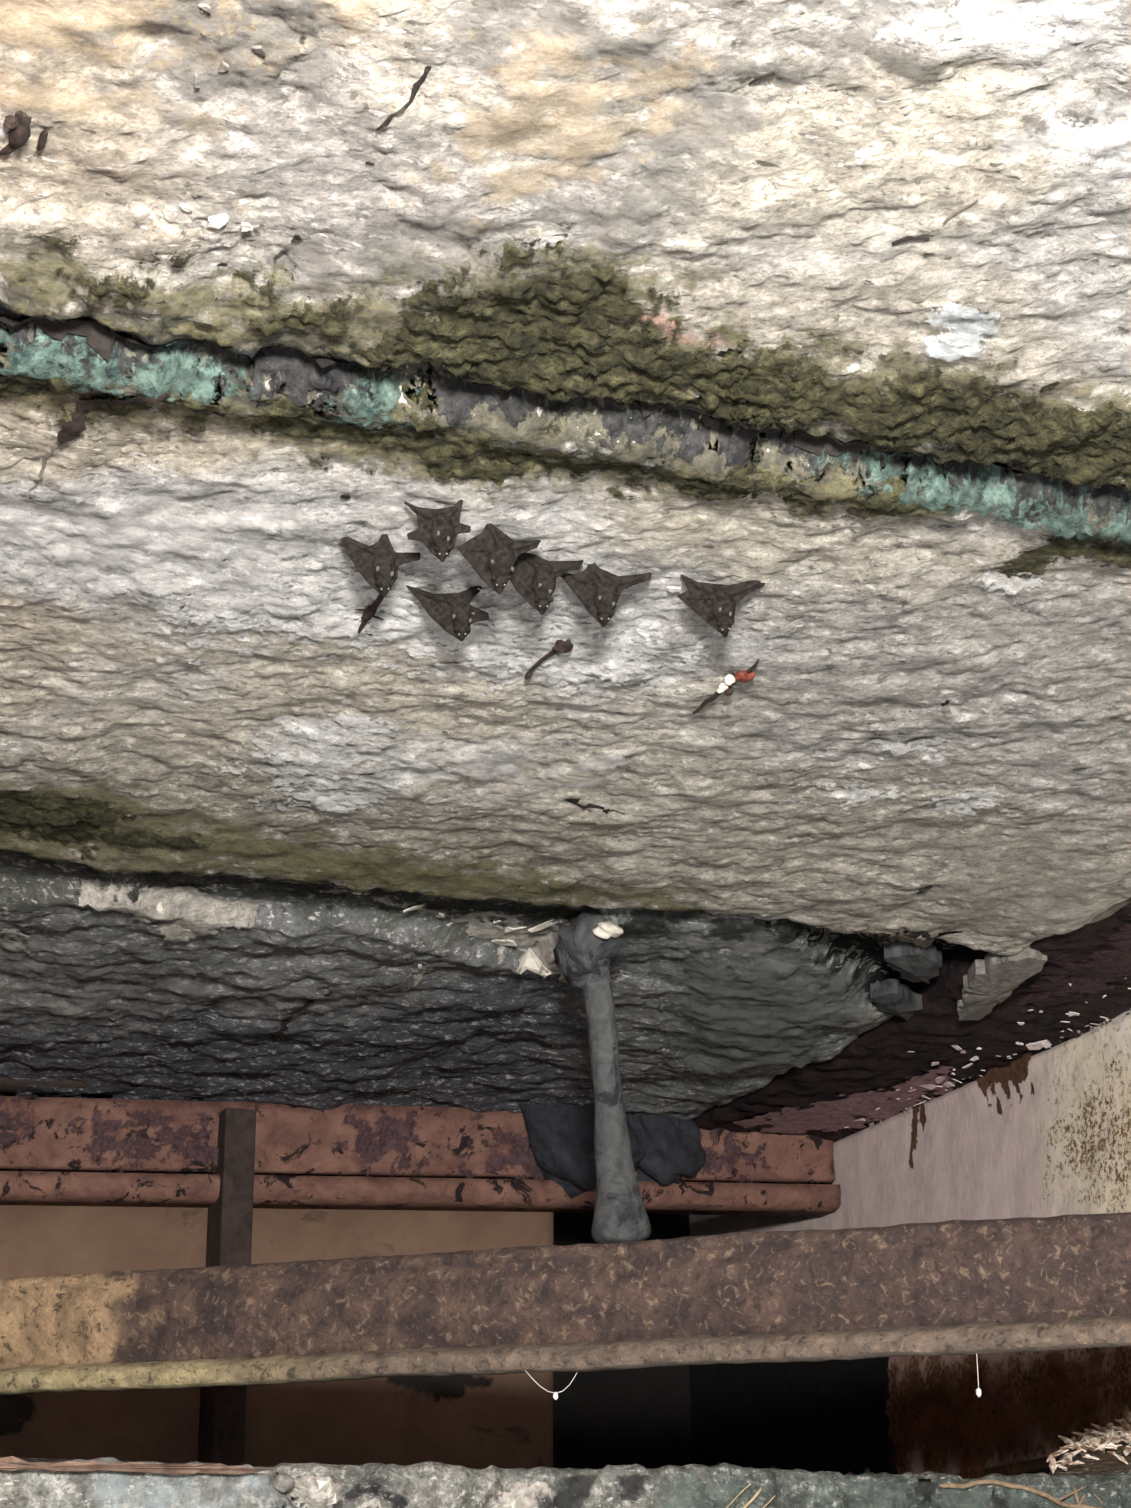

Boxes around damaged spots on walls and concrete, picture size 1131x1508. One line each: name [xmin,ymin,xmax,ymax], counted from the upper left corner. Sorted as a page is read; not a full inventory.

crack [0,110,48,156]
crack [0,392,171,498]
leakage [0,277,1131,546]
crack [1040,381,1062,392]
crack [169,558,227,624]
leakage [0,481,745,710]
leakage [966,570,1048,613]
corrosion [0,1050,1131,1479]